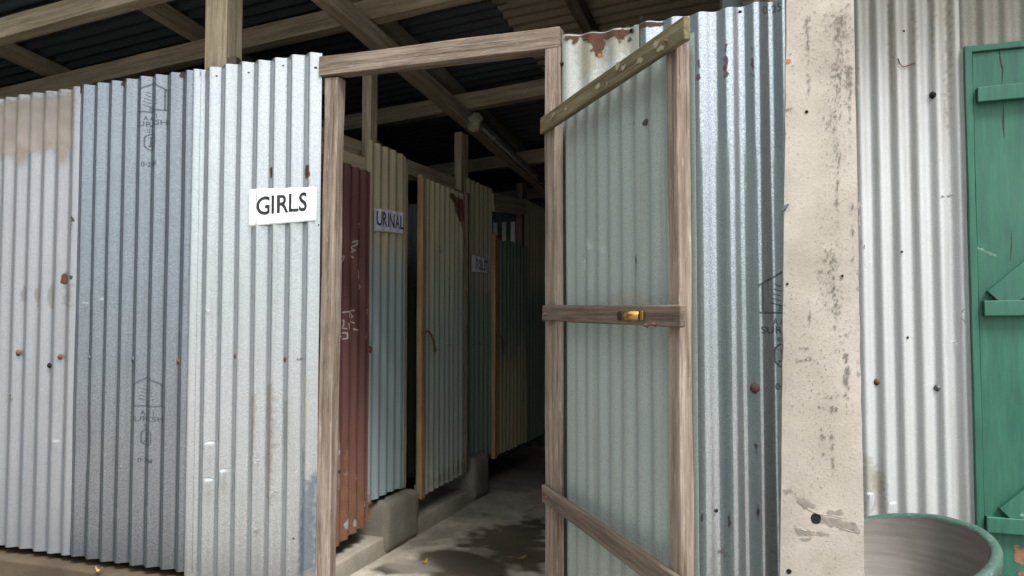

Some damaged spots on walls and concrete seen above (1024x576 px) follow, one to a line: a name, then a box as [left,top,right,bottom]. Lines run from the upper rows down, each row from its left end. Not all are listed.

rust [564,16,664,57]
rust [450,193,464,229]
rust [336,449,370,544]